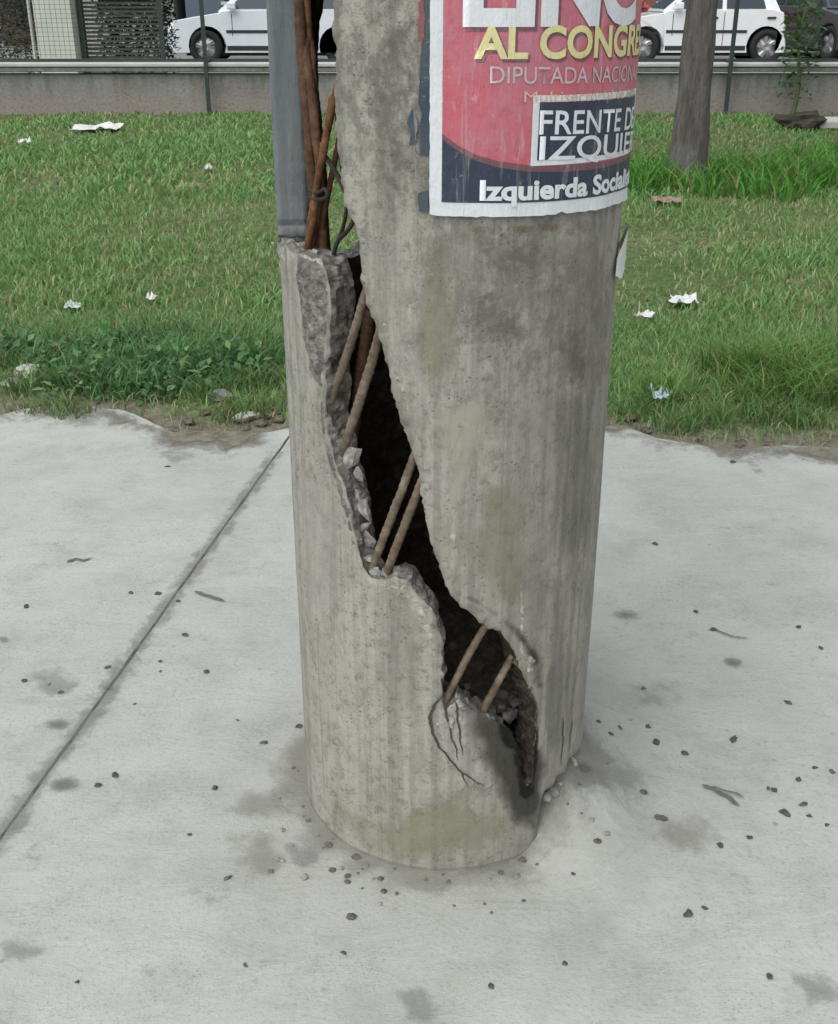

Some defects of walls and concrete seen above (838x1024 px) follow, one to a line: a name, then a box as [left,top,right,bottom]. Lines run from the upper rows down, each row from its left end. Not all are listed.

spalling [271,237,330,387]
spalling [320,400,437,662]
spalling [444,401,485,575]
spalling [520,579,536,672]
crack [428,696,482,788]
spalling [436,683,524,737]